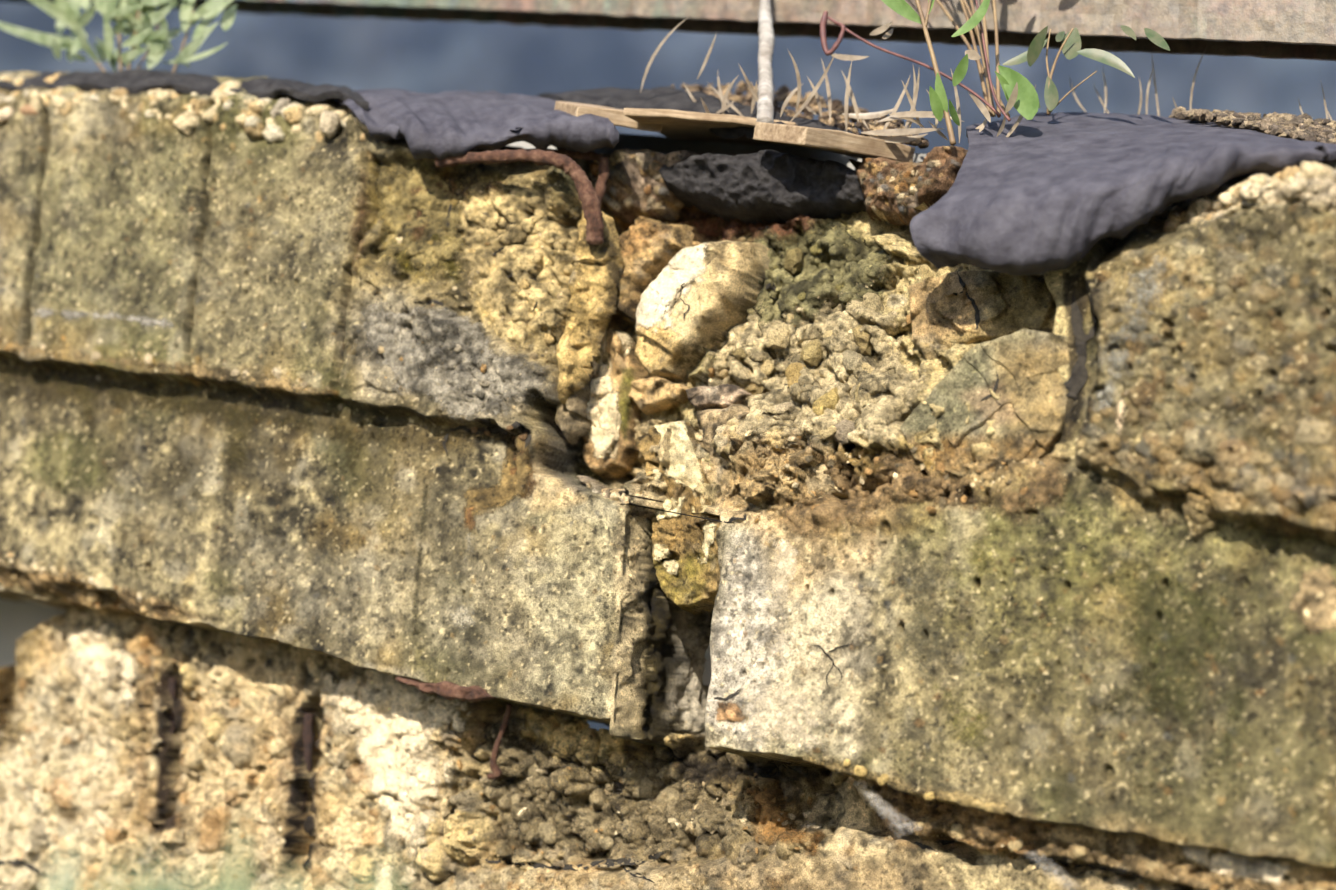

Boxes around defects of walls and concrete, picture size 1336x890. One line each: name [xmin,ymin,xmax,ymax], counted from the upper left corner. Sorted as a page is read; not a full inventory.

rust [411,148,609,245]
spalling [352,161,582,516]
spalling [711,222,1067,537]
crack [1063,289,1096,412]
crack [629,504,749,523]
spalling [0,665,16,730]
spalling [716,702,746,722]
spalling [480,722,742,859]
crack [908,840,955,852]
crack [1021,856,1148,883]